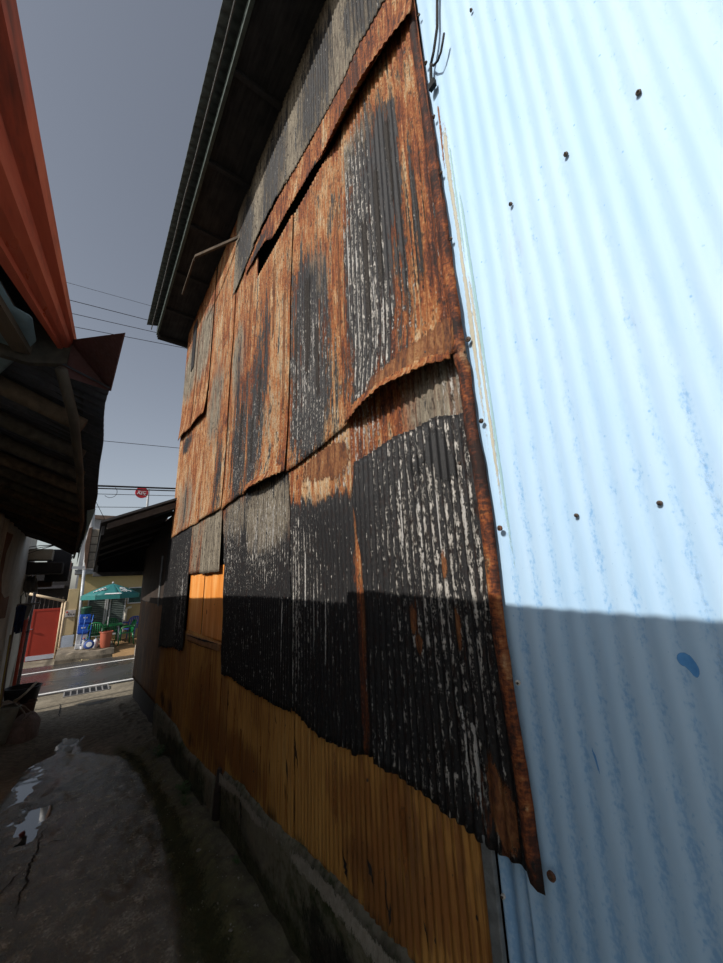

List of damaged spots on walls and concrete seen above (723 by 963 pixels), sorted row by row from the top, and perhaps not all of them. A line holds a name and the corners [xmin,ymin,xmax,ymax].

rust [272,260,286,413]
rust [437,106,499,485]
rust [303,440,351,484]
peeling [295,553,326,665]
peeling [460,706,483,813]
rust [486,752,520,862]